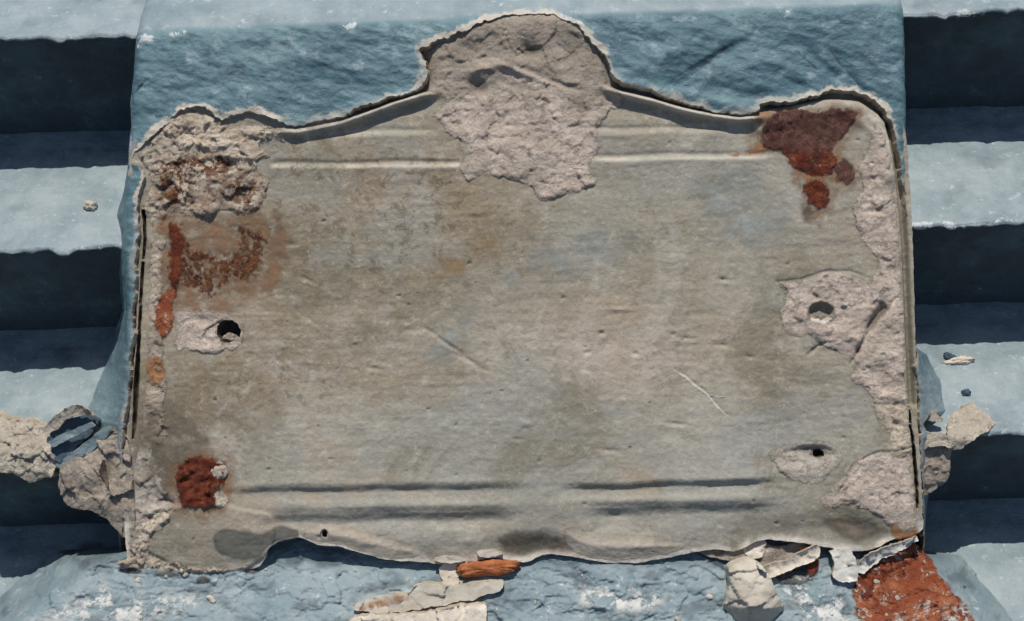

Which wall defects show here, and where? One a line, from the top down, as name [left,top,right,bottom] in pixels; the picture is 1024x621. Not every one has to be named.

spalling [422,14,624,201]
rust [733,106,860,220]
spalling [43,110,293,574]
rust [154,214,288,337]
spalling [699,125,955,621]
rust [170,452,231,517]